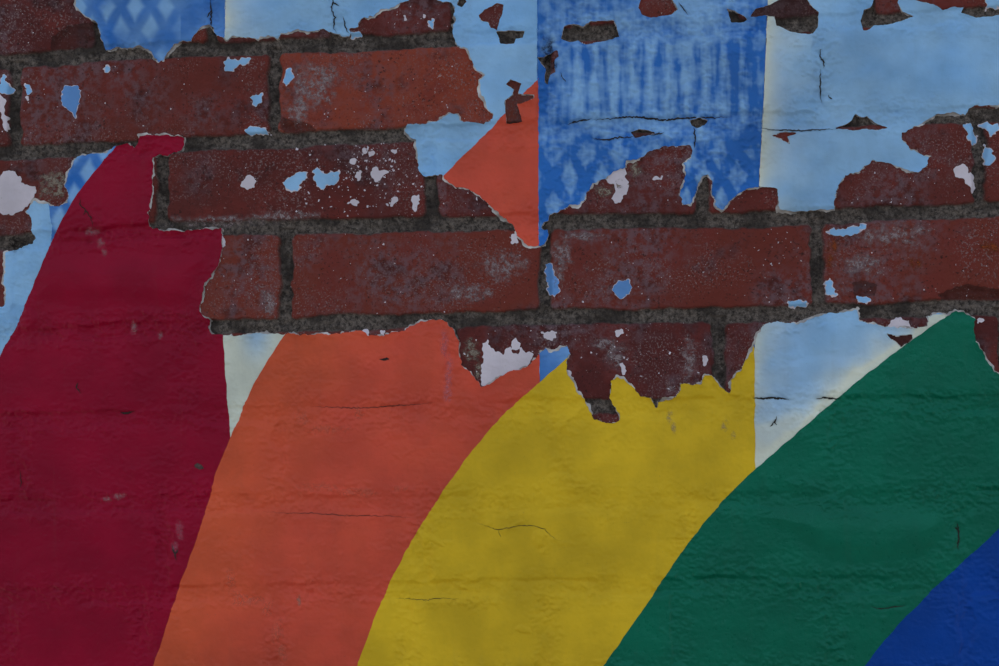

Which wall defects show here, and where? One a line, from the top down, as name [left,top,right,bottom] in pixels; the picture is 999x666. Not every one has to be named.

peeling [0,0,999,424]
crack [819,49,832,102]